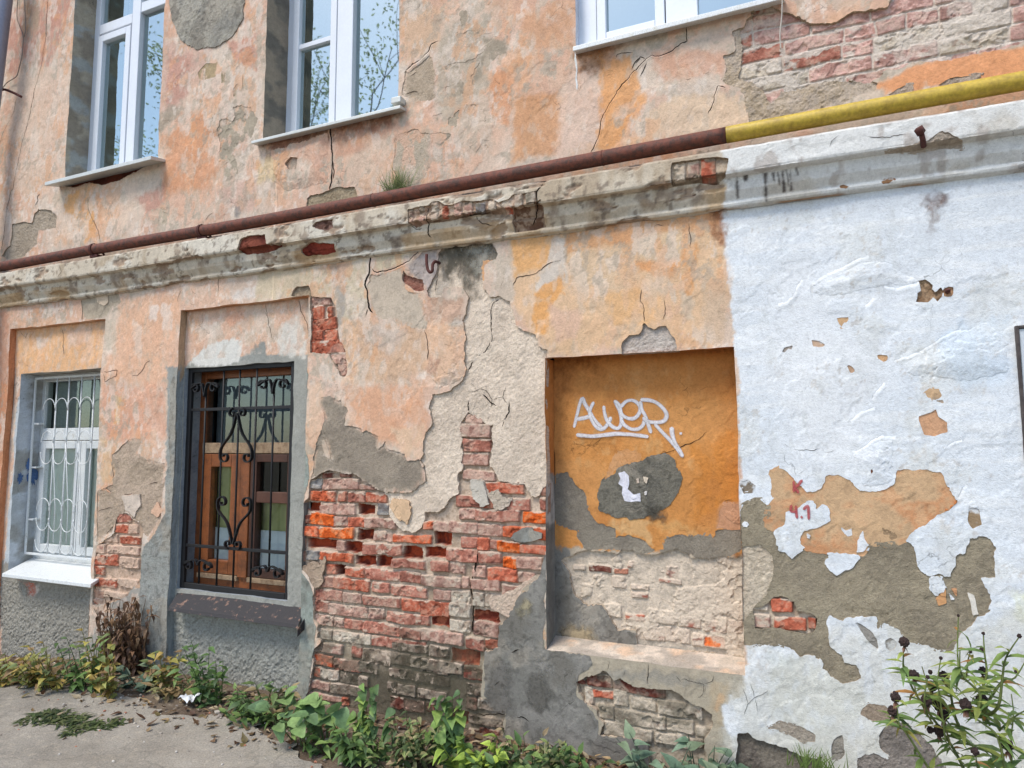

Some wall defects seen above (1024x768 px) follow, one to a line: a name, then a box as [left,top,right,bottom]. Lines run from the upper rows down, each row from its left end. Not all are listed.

crack [591,27,690,152]
spalling [721,0,1024,122]
spalling [3,210,57,260]
crack [327,129,335,190]
crack [363,209,440,314]
spalling [408,191,546,233]
spalling [293,286,347,377]
spalling [302,242,996,736]
spalling [88,436,165,657]